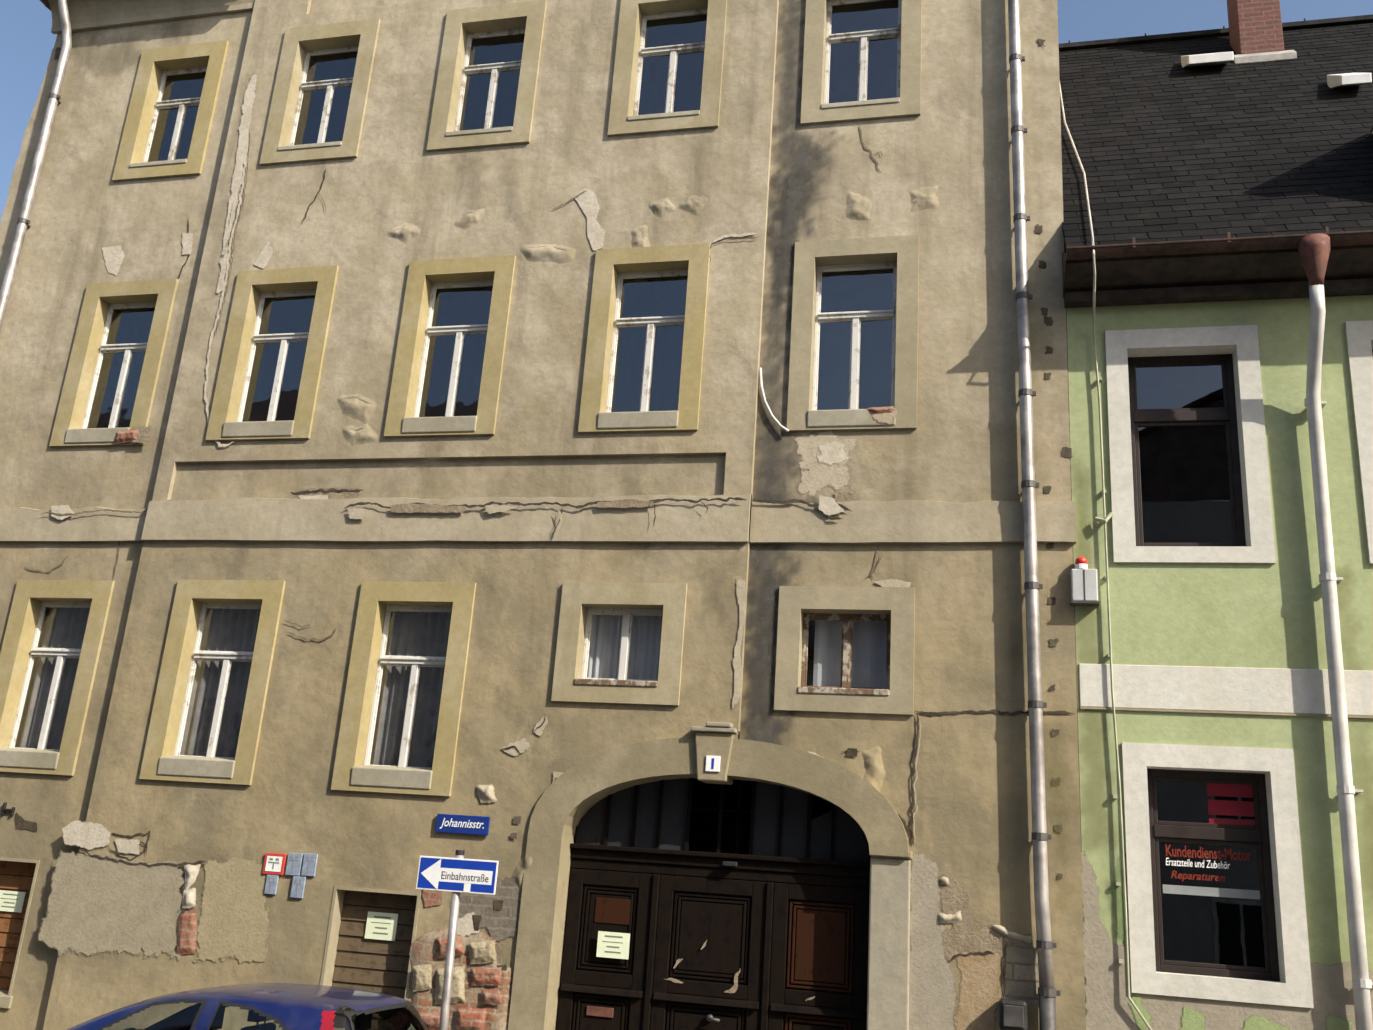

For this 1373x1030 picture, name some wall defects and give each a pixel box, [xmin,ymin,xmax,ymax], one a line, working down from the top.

crack [302,169,326,222]
damp [755,0,823,503]
crack [858,125,883,172]
crack [345,495,852,536]
flaking render [795,430,859,502]
damp [743,543,795,745]
flaking render [62,820,111,850]
crack [862,709,1076,846]
flaking render [175,860,206,954]
flaking render [410,877,521,1030]
flaking render [938,875,1039,1030]
peeling [1081,852,1373,1030]